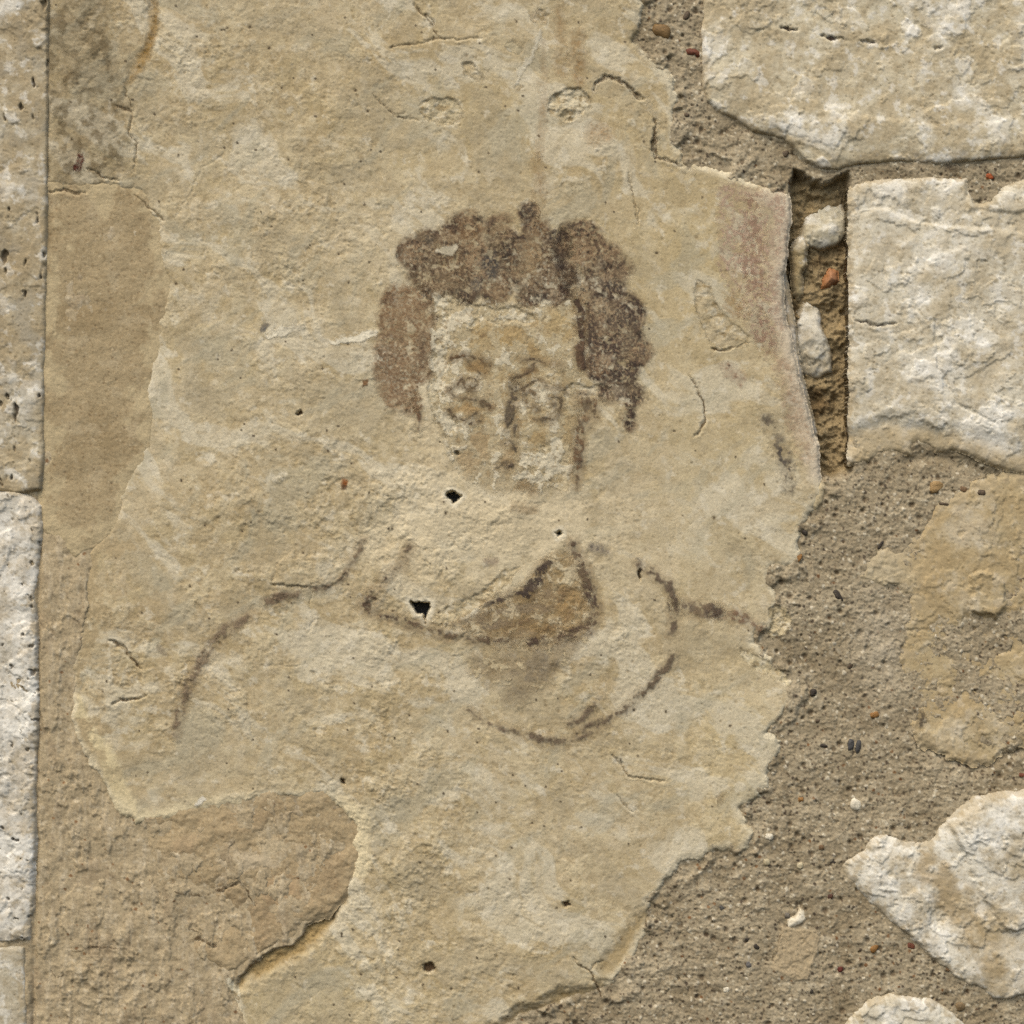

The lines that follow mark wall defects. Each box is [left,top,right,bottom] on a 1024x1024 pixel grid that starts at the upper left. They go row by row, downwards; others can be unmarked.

spalling [695,280,748,348]
spalling [769,605,792,638]
spalling [787,906,806,927]